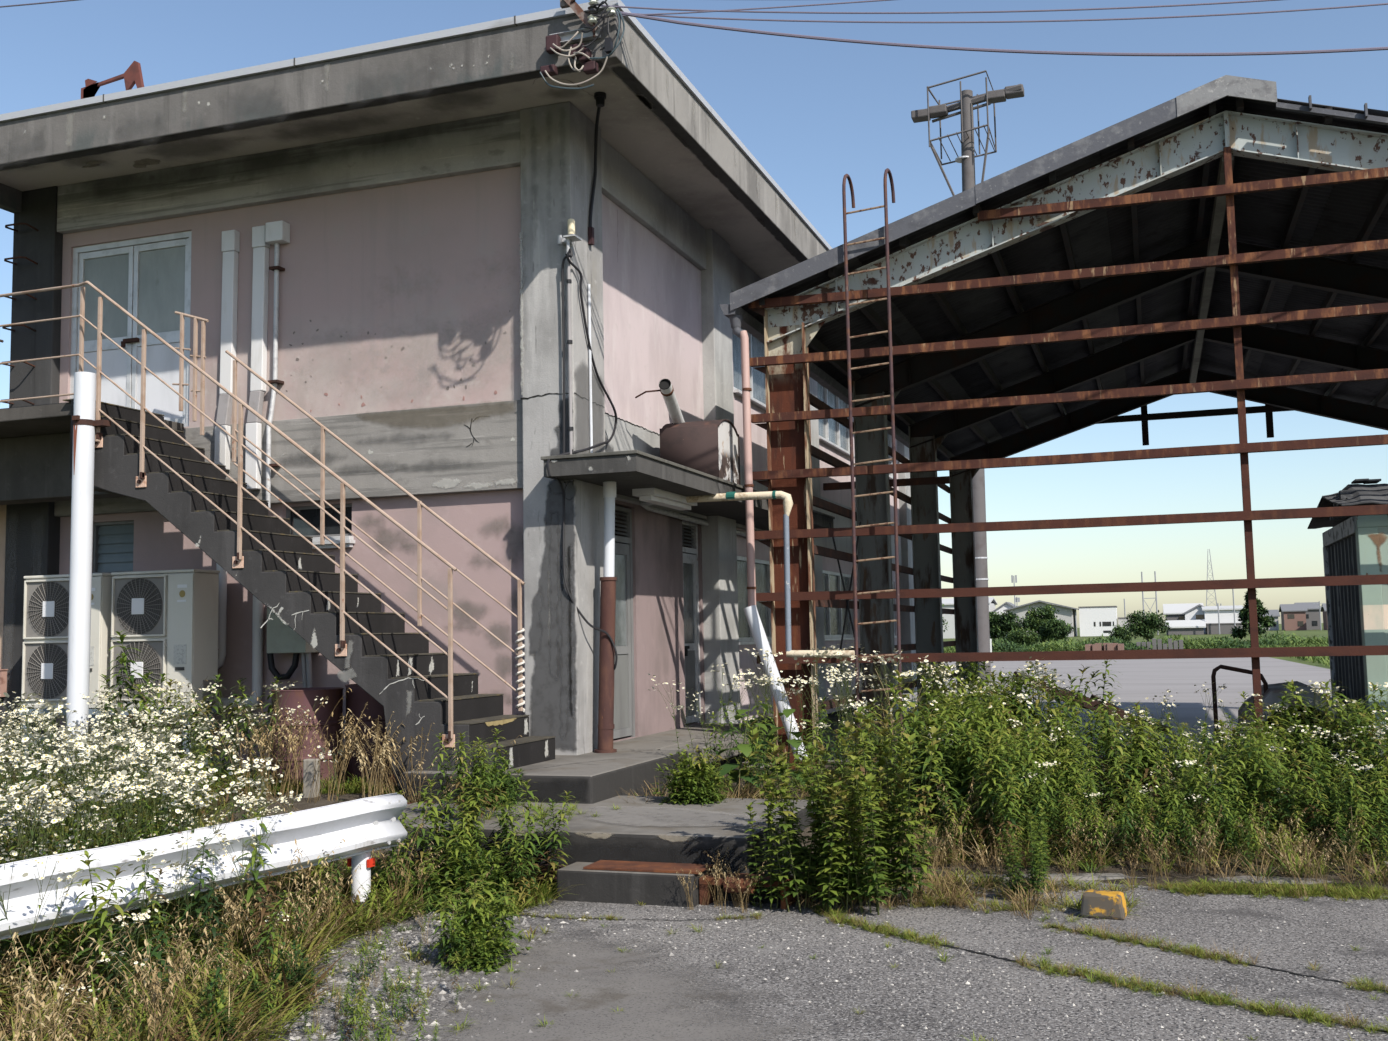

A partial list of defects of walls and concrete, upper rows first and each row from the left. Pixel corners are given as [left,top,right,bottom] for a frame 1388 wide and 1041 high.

leakage [550,398,573,462]
leakage [496,525,523,554]
rust [1369,533,1387,566]
leakage [515,480,577,756]
leakage [411,778,473,799]
leakage [508,748,587,803]